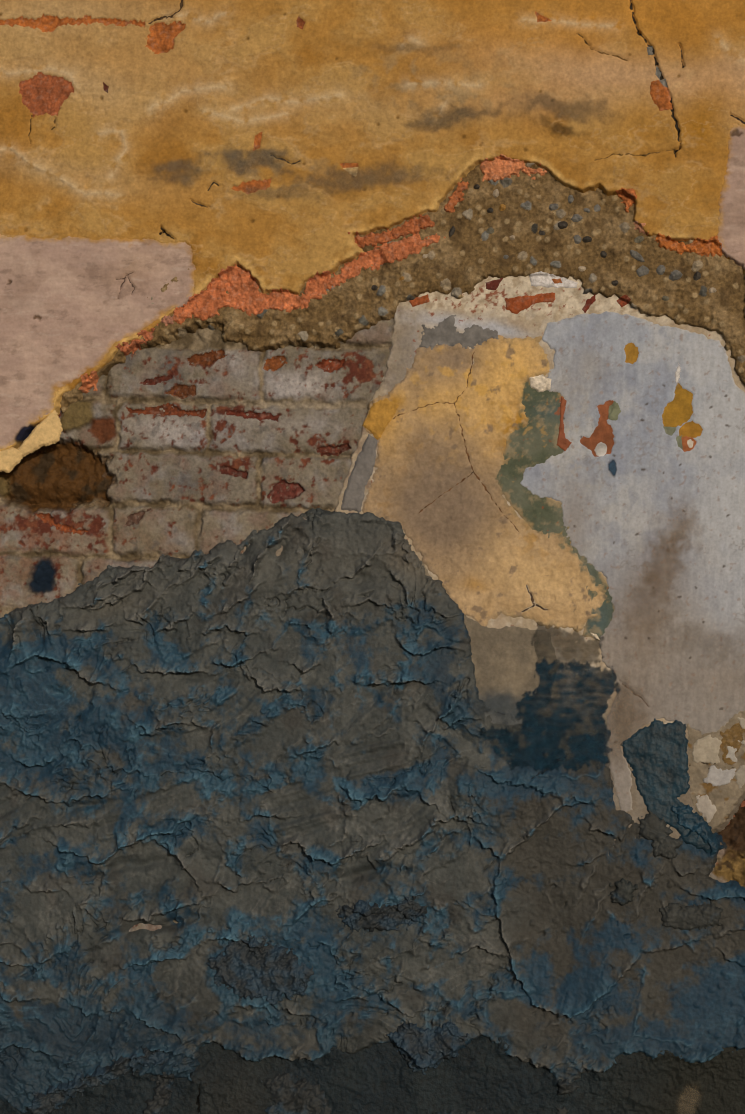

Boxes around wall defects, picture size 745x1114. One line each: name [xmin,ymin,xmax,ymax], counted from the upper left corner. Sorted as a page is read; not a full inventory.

crack [148,0,183,24]
spalling [0,14,186,54]
spalling [19,72,74,117]
crack [578,0,684,161]
spalling [0,154,745,473]
spalling [220,466,248,479]
spalling [267,479,305,504]
peeling [316,315,621,641]
spalling [124,508,151,527]